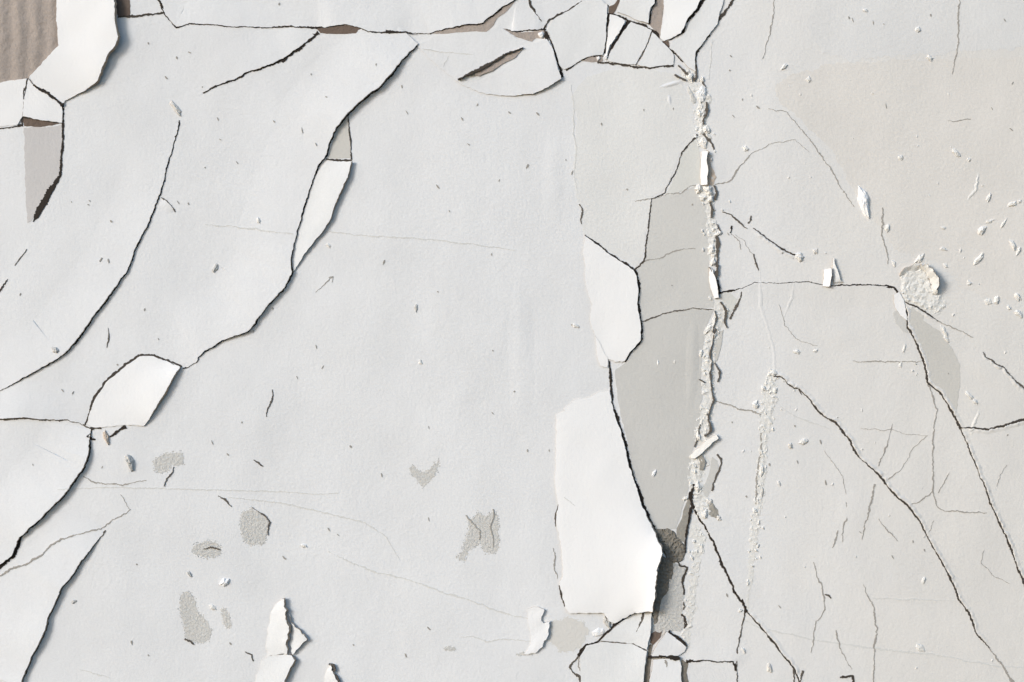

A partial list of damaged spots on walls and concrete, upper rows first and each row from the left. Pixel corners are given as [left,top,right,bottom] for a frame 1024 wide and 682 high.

peeling [0,0,130,223]
peeling [292,116,352,271]
spalling [317,25,361,34]
crack [762,2,774,59]
crack [952,0,961,74]
crack [0,0,734,682]
peeling [417,0,738,682]
crack [569,102,1024,682]